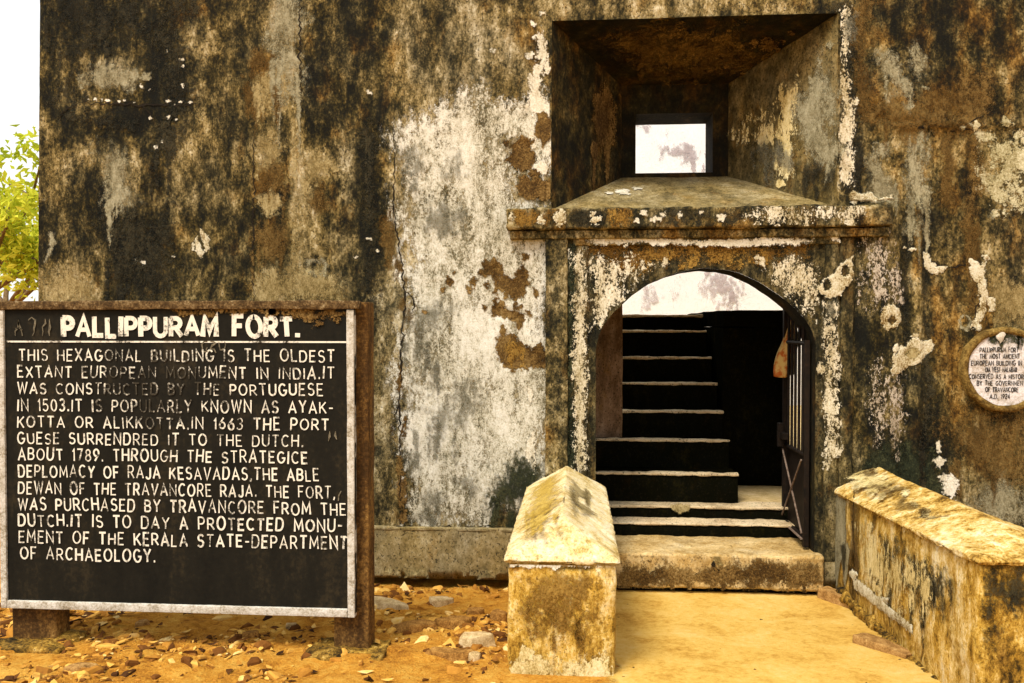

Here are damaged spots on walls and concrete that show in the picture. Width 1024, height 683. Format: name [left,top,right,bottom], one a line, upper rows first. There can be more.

water stain [43,0,201,301]
water stain [251,0,314,301]
crack [385,125,415,527]
water stain [401,302,481,476]
peeling [366,12,566,527]
water stain [451,243,810,538]
flaking render [568,5,947,473]
water stain [754,0,940,493]
water stain [879,533,953,649]
peeling [968,254,996,331]
water stain [965,480,1024,524]
water stain [988,277,1024,353]